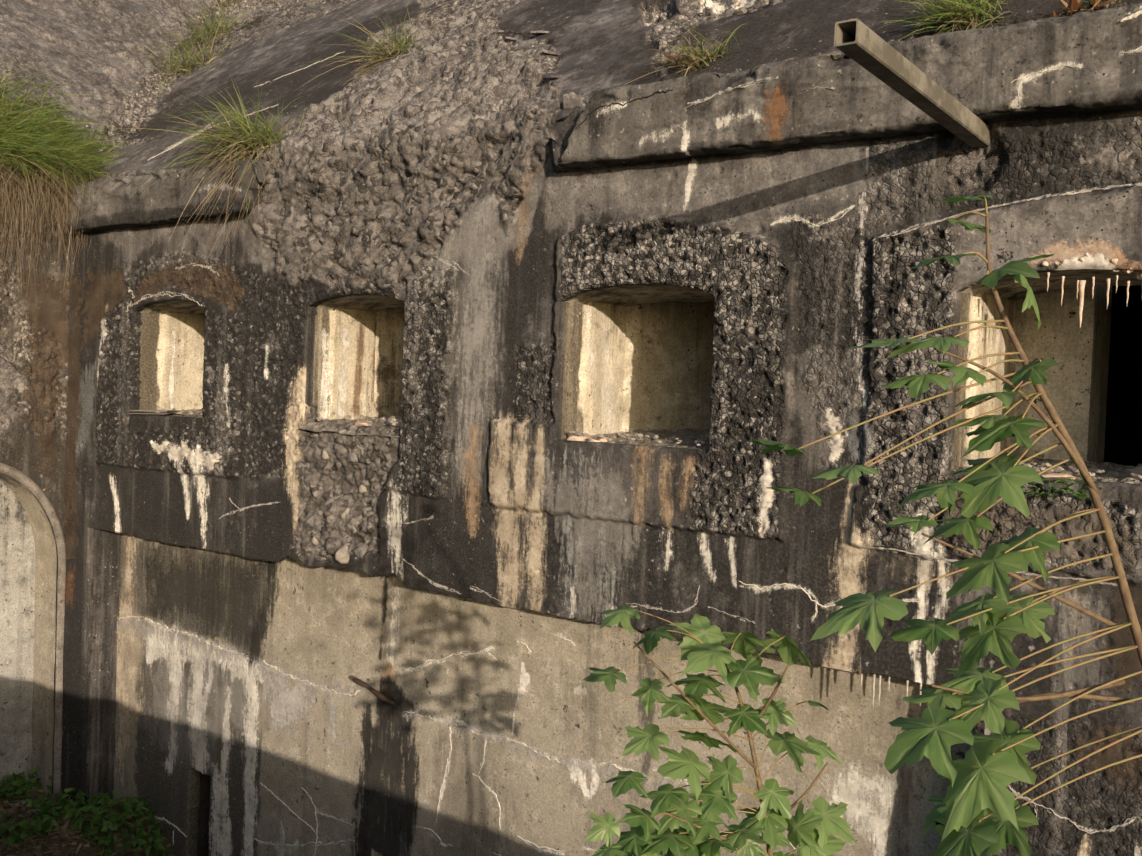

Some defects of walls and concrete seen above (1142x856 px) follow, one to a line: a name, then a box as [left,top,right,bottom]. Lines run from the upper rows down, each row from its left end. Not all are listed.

corrosion [764,84,796,145]
crack [873,183,1142,241]
water stain [634,446,695,570]
water stain [700,532,716,580]
water stain [725,537,737,587]
water stain [910,509,950,620]
crack [625,586,755,624]
crack [739,581,837,621]
water stain [109,440,618,856]
water stain [909,640,937,685]
crack [404,710,690,856]
crack [1008,785,1140,834]